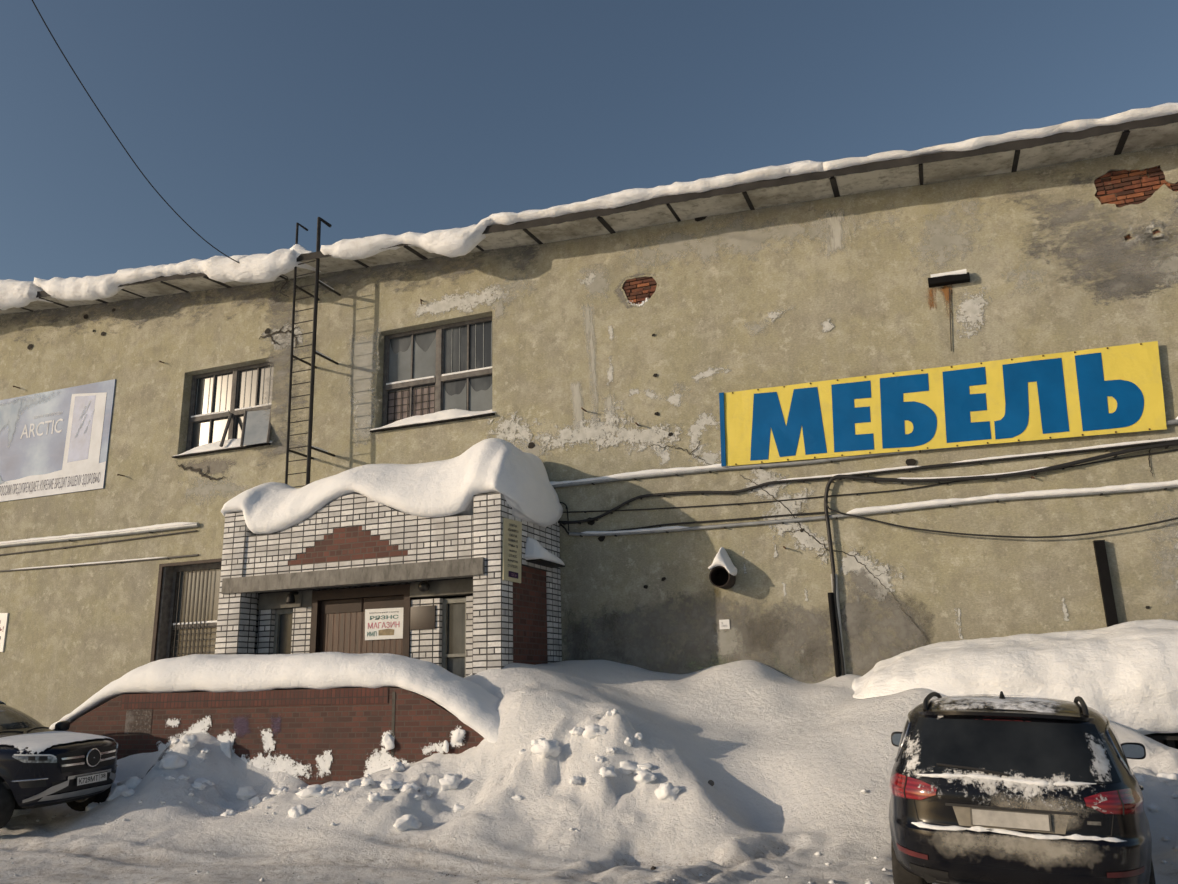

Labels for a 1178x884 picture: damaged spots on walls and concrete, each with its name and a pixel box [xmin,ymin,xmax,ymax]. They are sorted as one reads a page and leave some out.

spalling [1094,166,1178,208]
spalling [1094,210,1178,250]
peeling [415,278,531,318]
spalling [616,273,657,308]
rust [928,285,952,312]
peeling [953,286,990,338]
peeling [487,365,731,465]
crack [651,440,930,644]